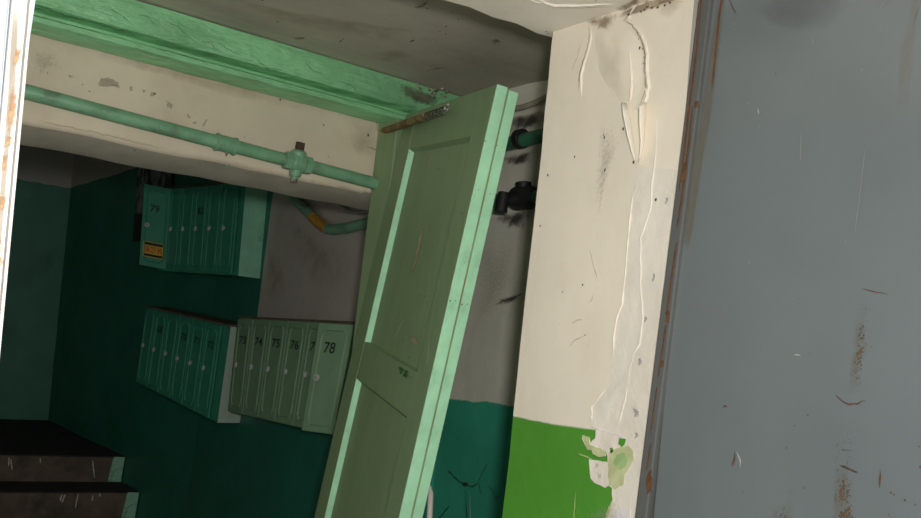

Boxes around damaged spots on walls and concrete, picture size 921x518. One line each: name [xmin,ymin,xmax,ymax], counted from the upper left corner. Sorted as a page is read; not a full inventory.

rust [0,25,21,241]
peeling [99,78,119,87]
rust [676,0,722,226]
peeling [582,85,678,518]
rust [658,243,677,376]